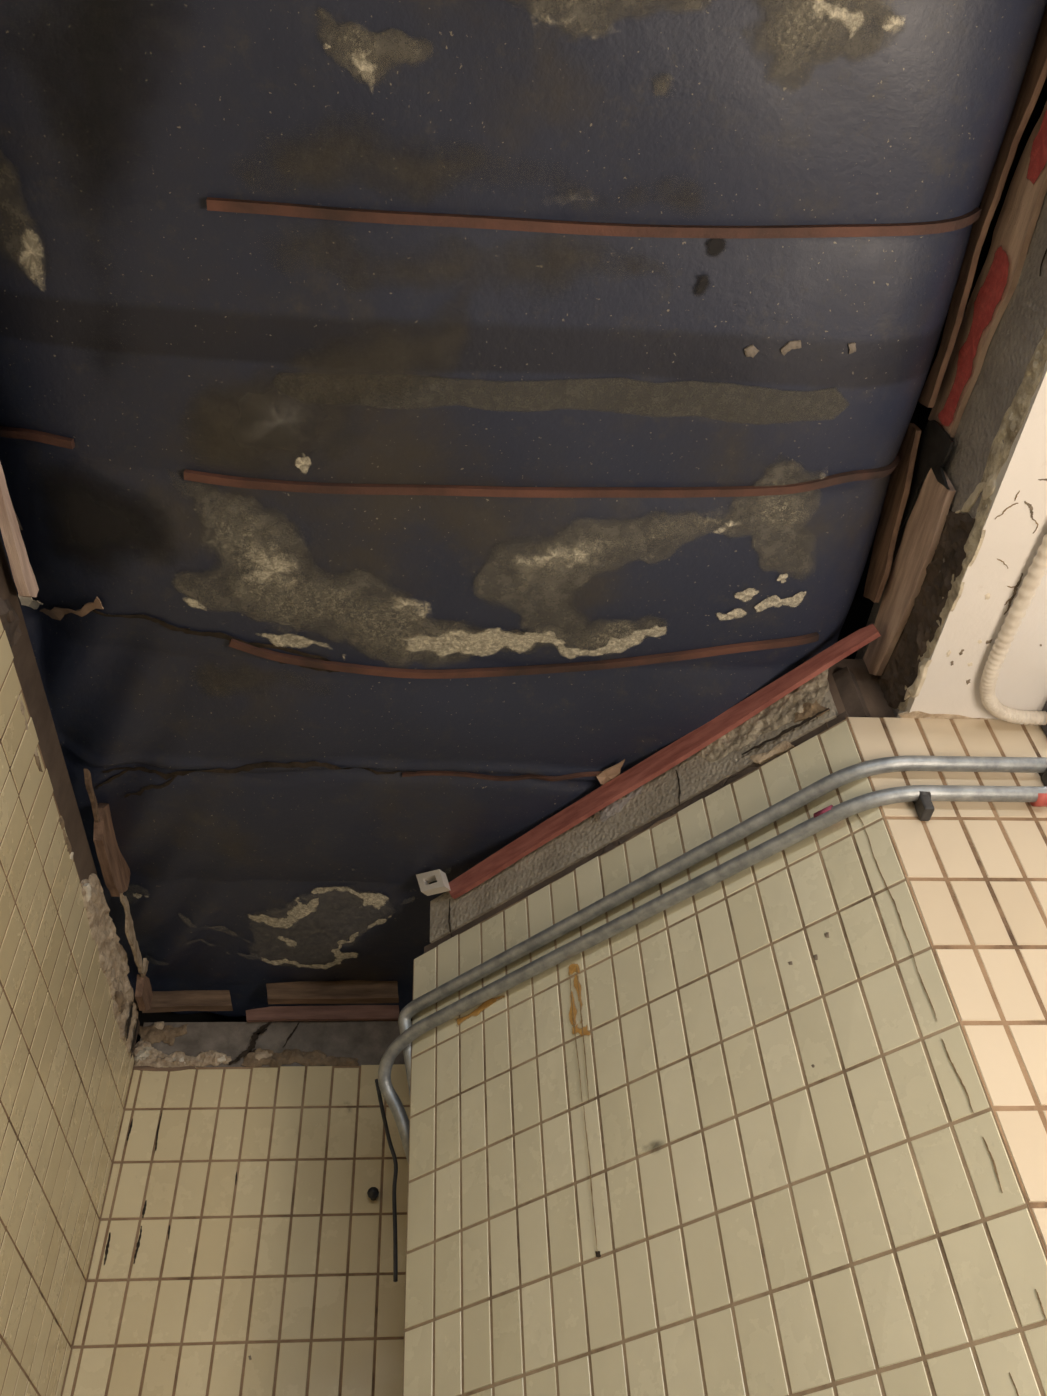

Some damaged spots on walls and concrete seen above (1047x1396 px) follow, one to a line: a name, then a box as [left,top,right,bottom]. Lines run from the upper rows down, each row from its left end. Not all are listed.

water stain [320,10,432,82]
water stain [757,0,905,87]
peeling [744,344,759,358]
peeling [780,340,802,356]
spalling [877,327,1047,720]
crack [995,479,1047,533]
water stain [174,461,819,666]
crack [997,559,1023,615]
crack [82,605,339,673]
spalling [81,873,359,1072]
rust [569,964,590,1036]
crack [229,1021,300,1065]